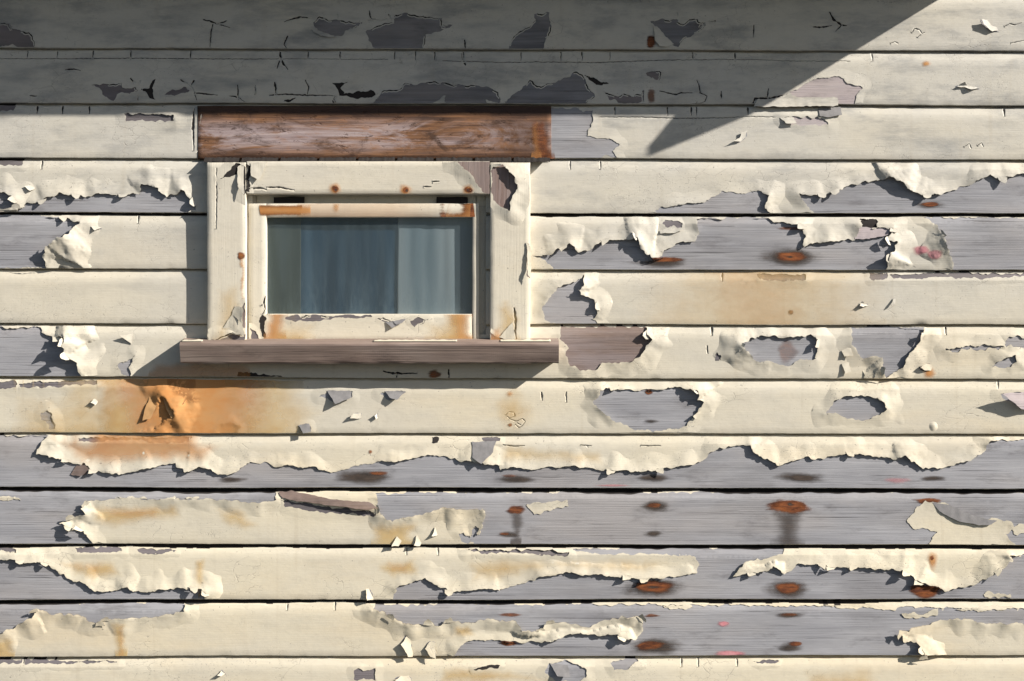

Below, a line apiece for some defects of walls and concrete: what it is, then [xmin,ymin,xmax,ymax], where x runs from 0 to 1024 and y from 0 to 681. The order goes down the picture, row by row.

peeling [304,4,465,48]
peeling [501,4,560,49]
peeling [980,19,999,33]
peeling [82,73,196,134]
peeling [754,68,871,136]
rust [770,250,811,265]
rust [88,378,258,456]
peeling [0,158,1024,681]
rust [768,500,810,544]
rust [629,580,676,594]
rust [910,585,940,598]
rust [638,640,677,653]